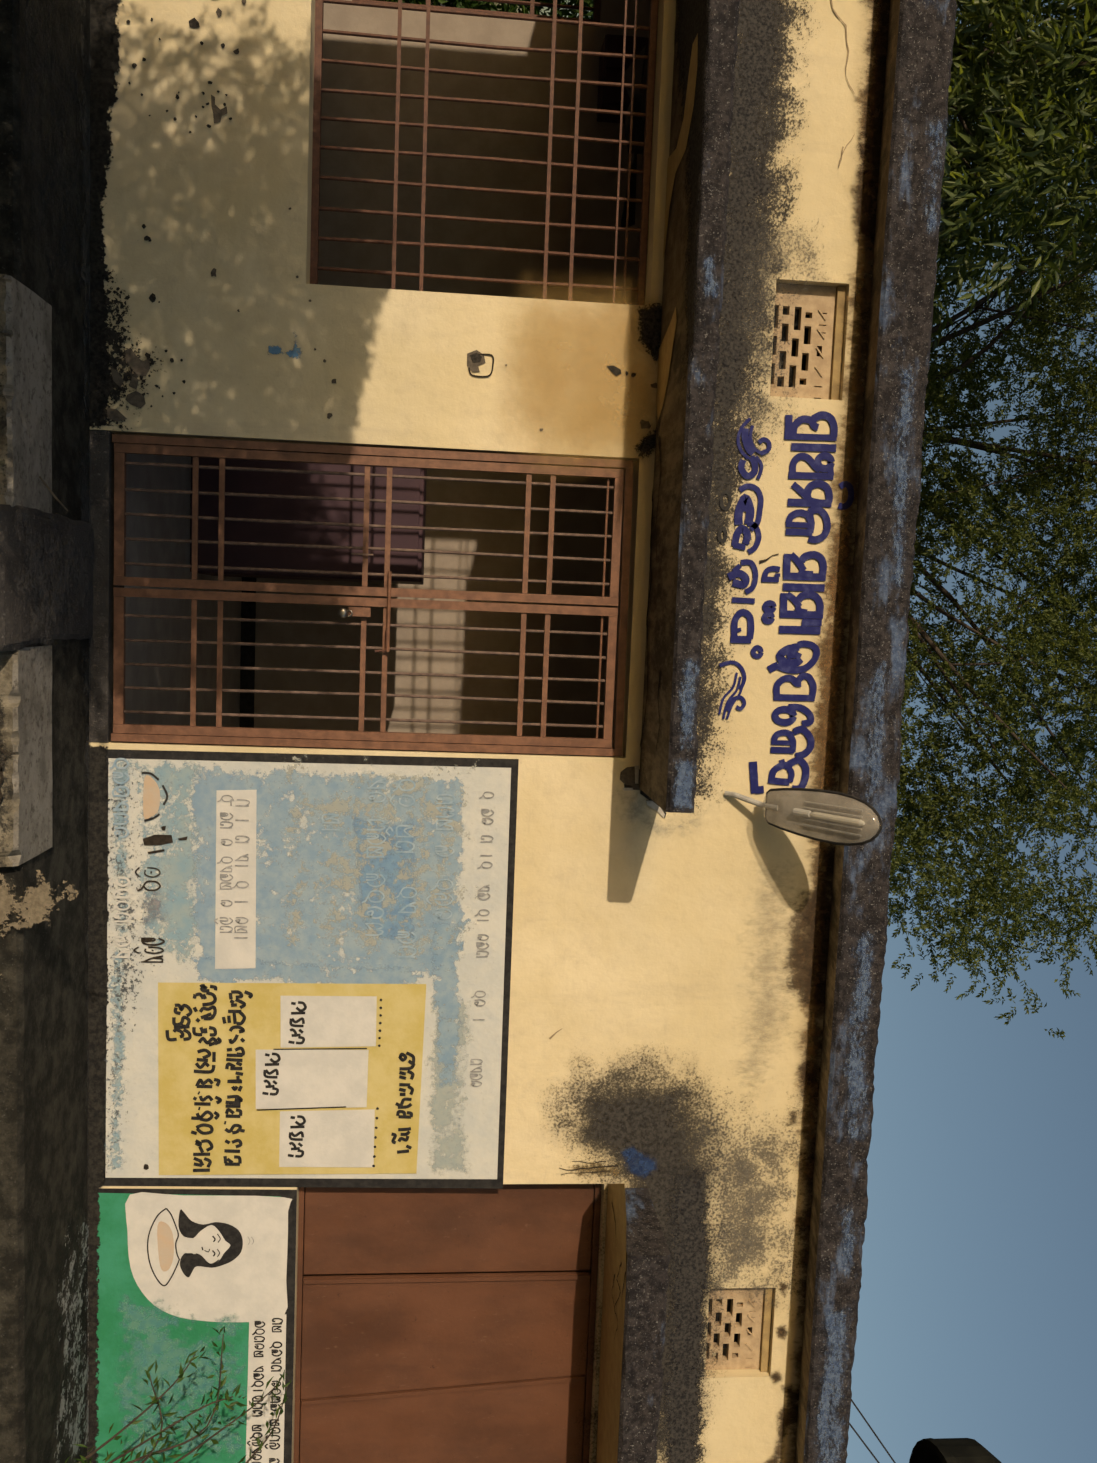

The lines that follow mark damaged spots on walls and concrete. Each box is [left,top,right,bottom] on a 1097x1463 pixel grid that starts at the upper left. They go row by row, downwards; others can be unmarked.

leakage [89,0,123,428]
leakage [674,0,714,388]
crack [831,0,855,94]
leakage [854,0,890,239]
leakage [536,303,662,433]
leakage [694,0,826,812]
leakage [811,531,850,791]
leakage [785,844,835,1004]
leakage [543,1050,819,1463]